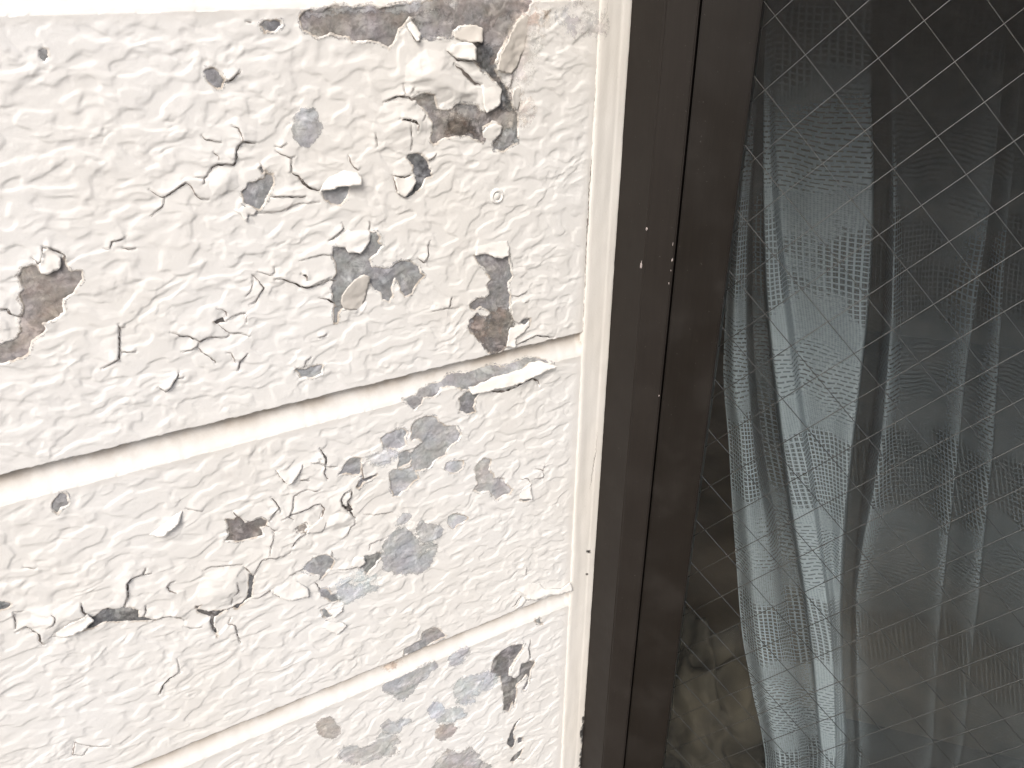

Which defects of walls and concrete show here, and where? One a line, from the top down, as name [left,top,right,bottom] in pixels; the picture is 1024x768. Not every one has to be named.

peeling [298,0,532,197]
crack [150,126,256,217]
peeling [0,247,85,363]
crack [161,269,336,392]
peeling [304,223,424,323]
peeling [339,241,556,533]
crack [271,449,337,519]
peeling [51,570,165,638]
peeling [180,505,326,633]
peeling [292,512,467,635]
peeling [382,646,470,702]
peeling [427,641,534,768]